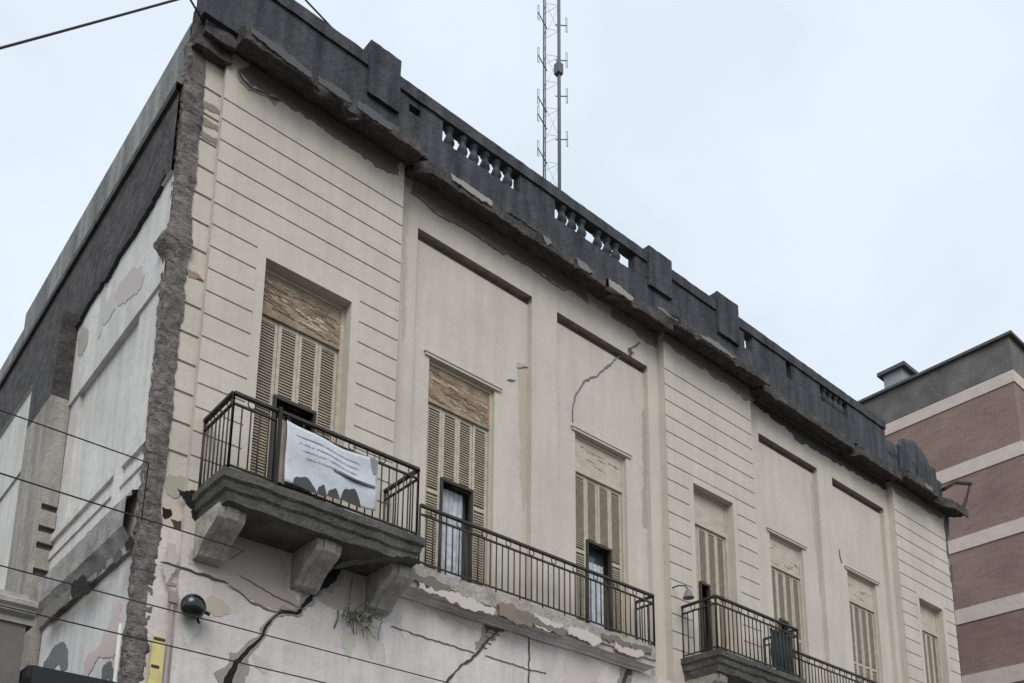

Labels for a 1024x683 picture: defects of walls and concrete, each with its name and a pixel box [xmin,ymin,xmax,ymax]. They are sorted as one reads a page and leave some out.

peeling [250,27,393,131]
spalling [83,42,364,683]
crack [572,342,640,422]
crack [161,556,421,683]
crack [391,626,546,683]
peeling [411,583,644,683]